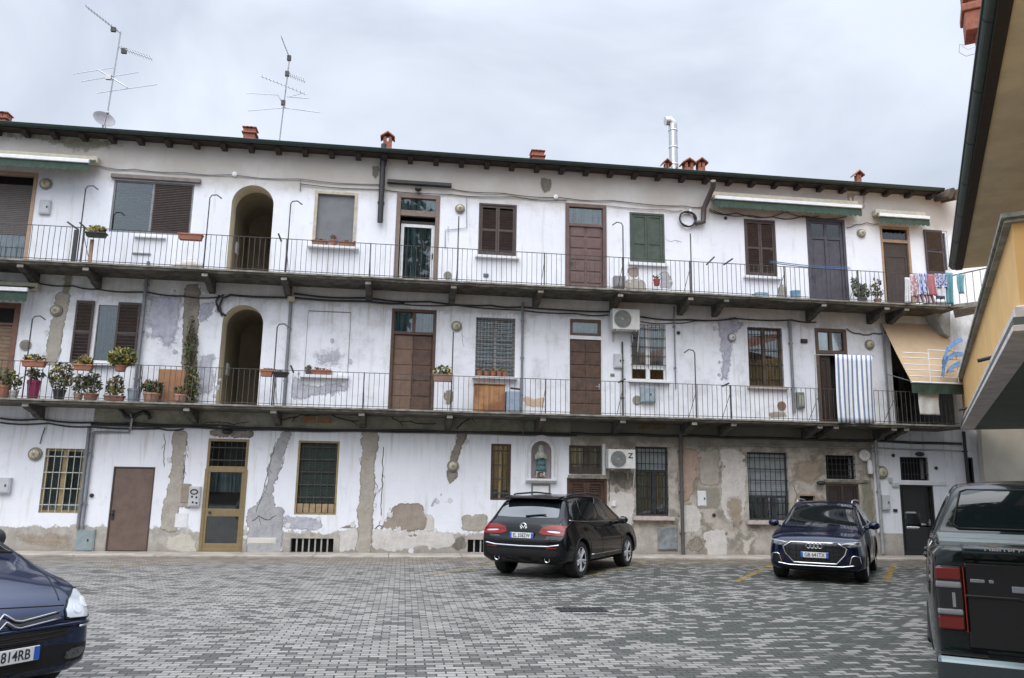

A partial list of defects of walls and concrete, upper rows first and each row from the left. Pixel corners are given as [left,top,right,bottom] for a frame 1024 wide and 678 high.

flaking render [42,292,71,366]
peeling [146,284,222,400]
peeling [713,315,742,380]
flaking render [159,430,190,532]
flaking render [243,431,322,552]
flaking render [339,432,488,553]
flaking render [673,446,748,555]